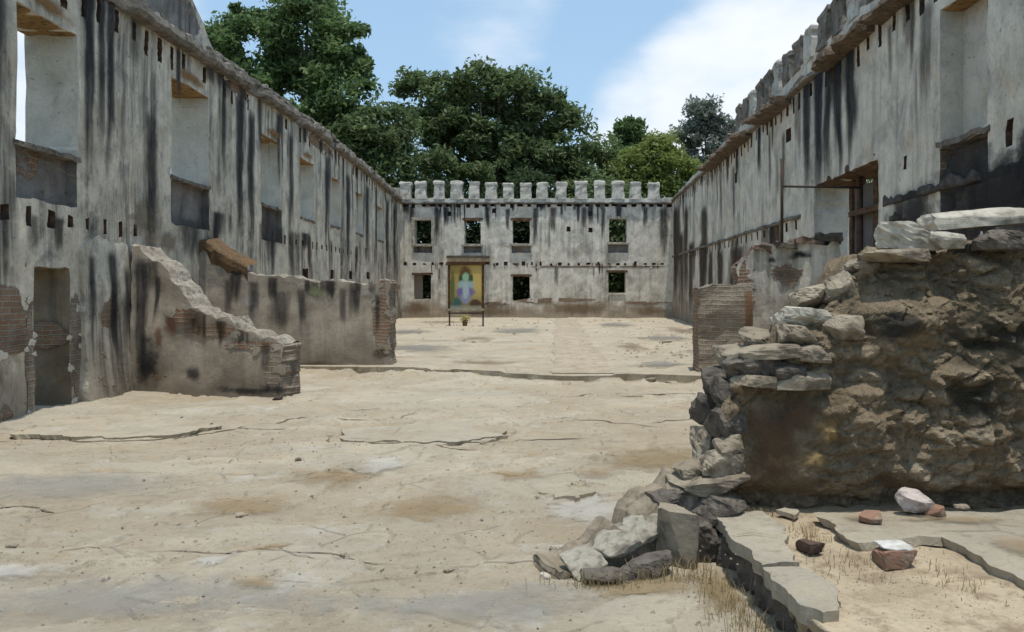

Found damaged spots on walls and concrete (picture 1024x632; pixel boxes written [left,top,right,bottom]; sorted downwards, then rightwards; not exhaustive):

water stain [84,0,116,157]
water stain [148,117,156,209]
water stain [207,66,262,224]
water stain [277,113,311,273]
water stain [319,139,415,267]
water stain [533,204,621,240]
water stain [802,49,856,190]
spalling [0,296,38,414]
crack [37,417,307,454]
spalling [165,302,286,398]
spalling [362,279,397,354]
crack [326,340,688,450]